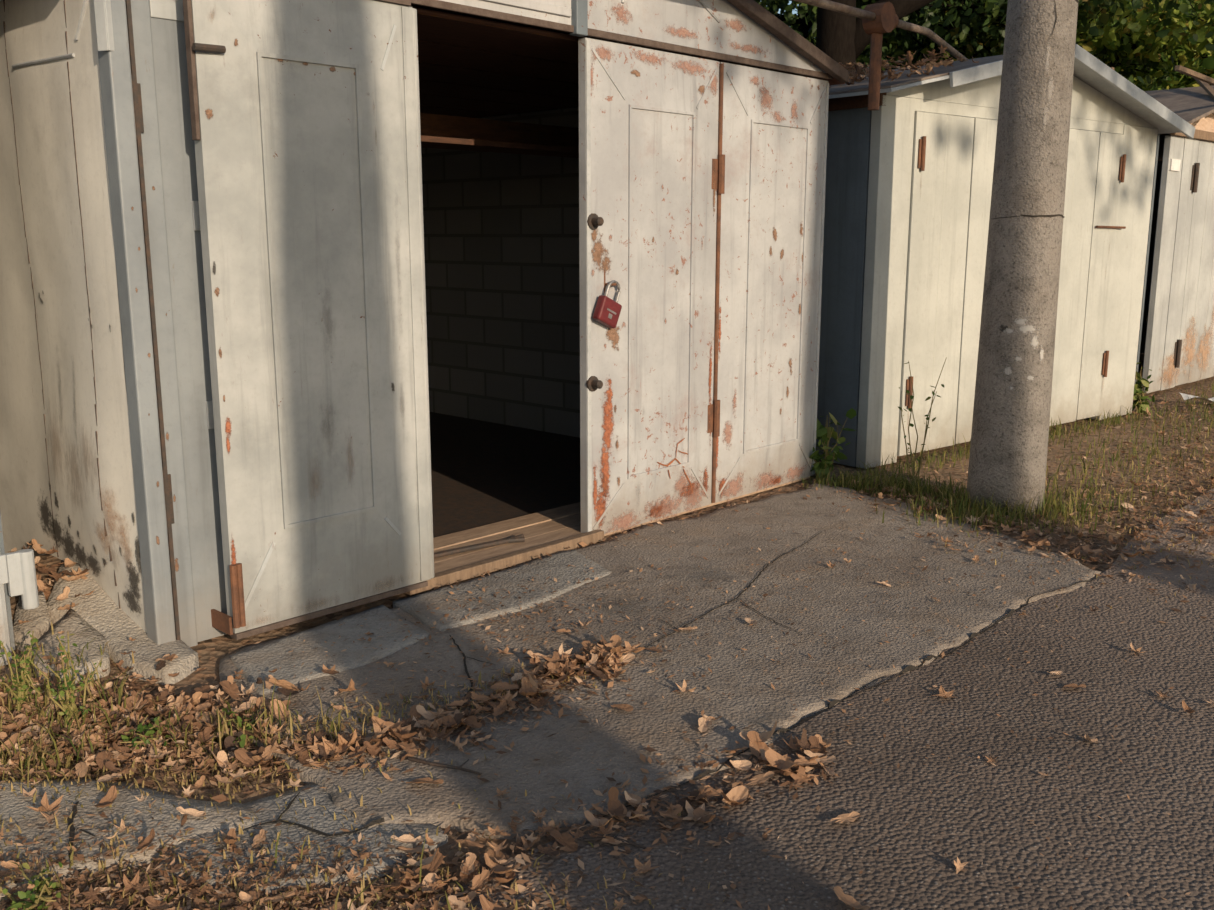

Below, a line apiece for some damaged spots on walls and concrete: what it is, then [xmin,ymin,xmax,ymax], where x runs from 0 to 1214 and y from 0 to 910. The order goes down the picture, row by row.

peeling [591,47,614,85]
peeling [631,53,717,95]
peeling [666,27,698,38]
peeling [726,19,763,53]
peeling [751,77,798,123]
corrosion [709,307,721,405]
corrosion [1163,315,1214,380]
corrosion [593,379,743,533]
leakage [37,483,106,577]
leakage [119,540,141,614]
crack [646,531,822,647]
crack [603,576,1107,817]